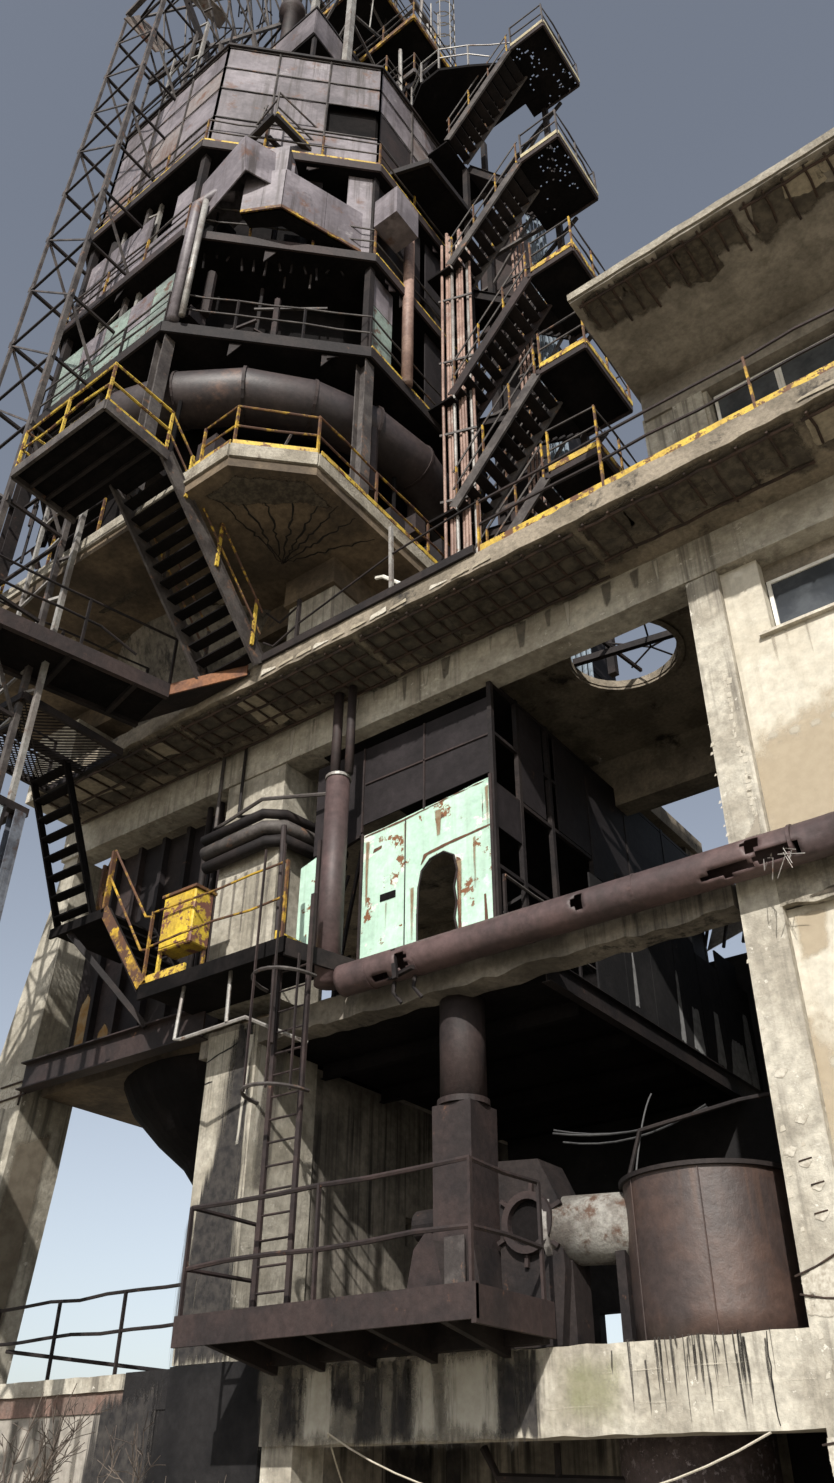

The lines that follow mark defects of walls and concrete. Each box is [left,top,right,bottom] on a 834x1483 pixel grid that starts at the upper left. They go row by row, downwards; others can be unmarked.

spalling [579,146,834,331]
crack [215,498,375,564]
peeling [365,781,483,853]
peeling [421,802,490,928]
corrosion [457,837,476,917]
leakage [278,1350,540,1446]
leakage [611,1328,775,1420]